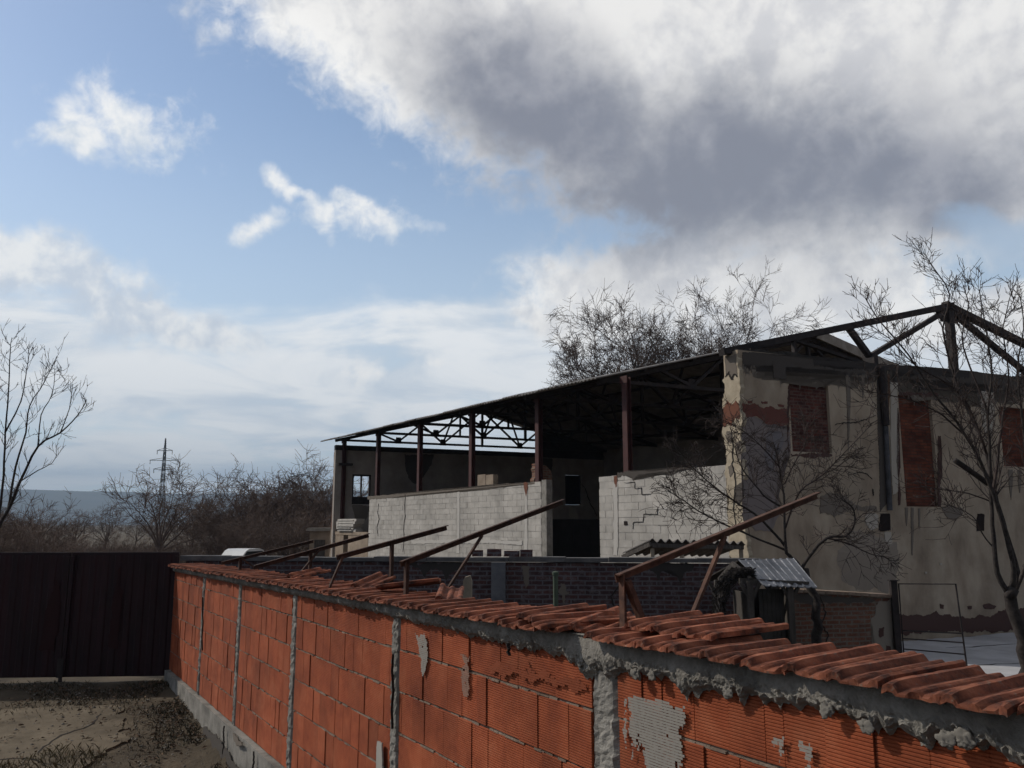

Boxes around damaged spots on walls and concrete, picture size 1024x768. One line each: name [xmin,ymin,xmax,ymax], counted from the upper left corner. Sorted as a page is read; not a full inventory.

spalling [723,386,832,533]